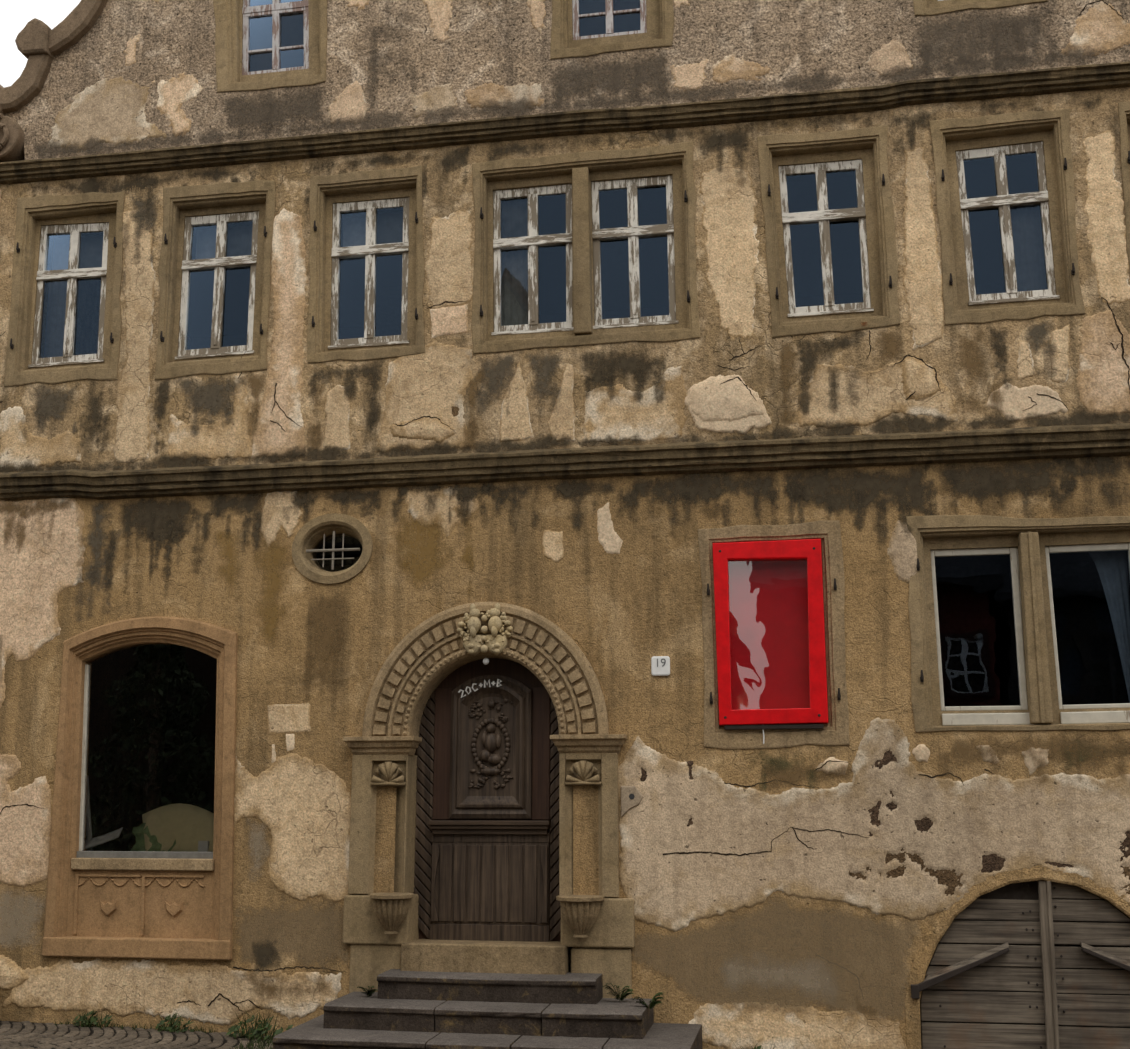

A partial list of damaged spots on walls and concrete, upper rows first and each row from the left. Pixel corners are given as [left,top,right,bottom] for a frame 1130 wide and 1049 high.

crack [270,383,300,432]
damp [583,352,664,401]
damp [780,331,863,421]
crack [1102,297,1130,390]
damp [549,456,1130,542]
peeling [0,498,85,708]
damp [76,493,286,639]
peeling [0,753,52,887]
peeling [234,703,352,903]
crack [663,827,870,856]
peeling [618,717,1130,932]
peeling [688,1003,907,1049]